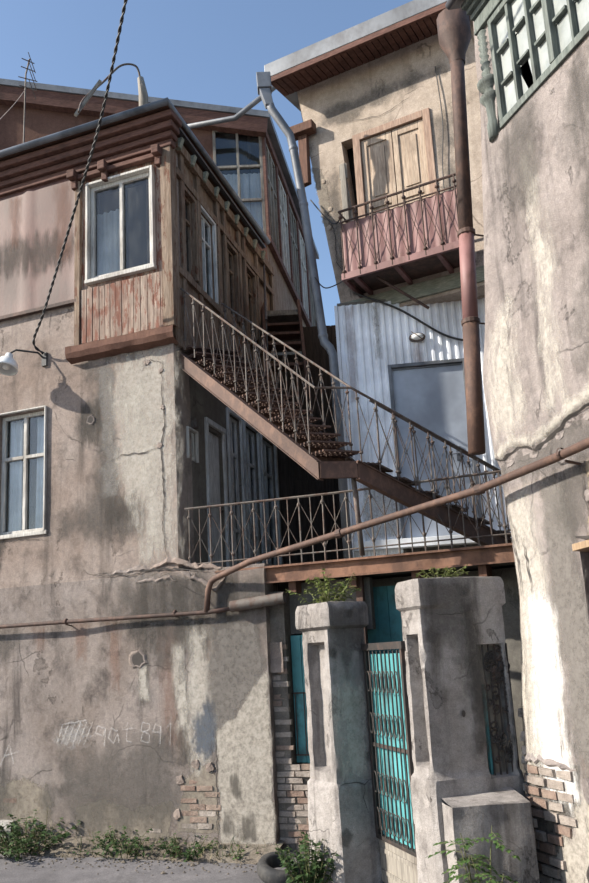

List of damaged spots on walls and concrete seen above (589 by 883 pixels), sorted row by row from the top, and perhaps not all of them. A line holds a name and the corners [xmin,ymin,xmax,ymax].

water stain [326,77,419,121]
water stain [63,366,155,537]
crack [94,359,215,606]
peeling [135,557,225,592]
water stain [121,574,259,772]
flaking render [74,759,221,840]
flaking render [518,702,589,883]